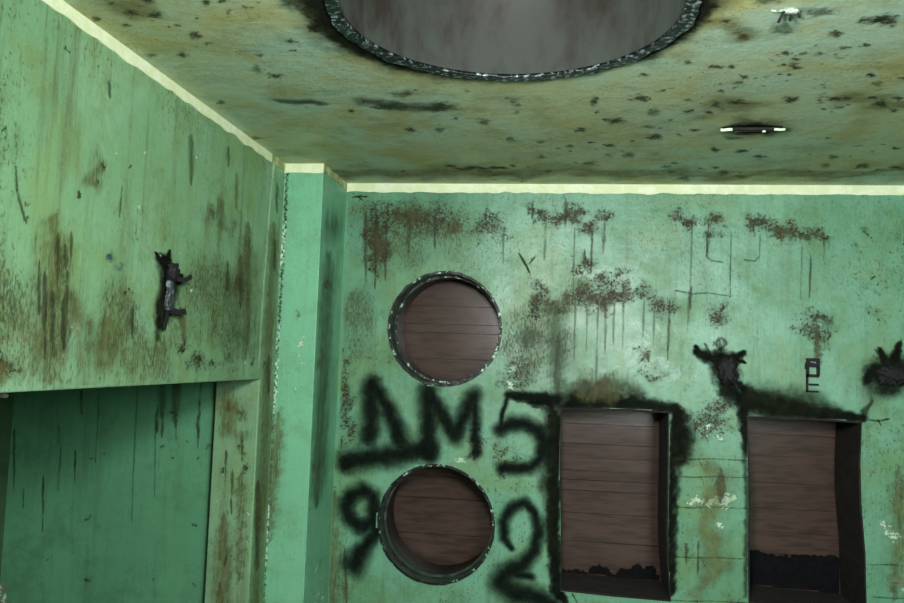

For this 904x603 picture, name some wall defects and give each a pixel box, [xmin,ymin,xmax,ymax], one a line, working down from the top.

corrosion [0,336,22,381]
corrosion [19,214,82,385]
damp [498,305,574,412]
corrosion [219,394,248,514]